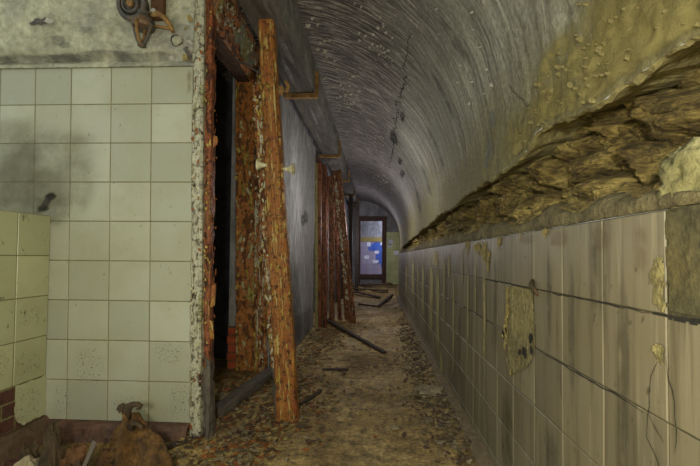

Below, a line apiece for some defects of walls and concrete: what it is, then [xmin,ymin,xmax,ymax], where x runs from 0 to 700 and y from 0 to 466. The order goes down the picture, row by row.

peeling [168,0,291,373]
crack [389,34,412,162]
spalling [388,22,700,274]
spalling [501,279,538,375]
crack [485,279,646,313]
spalling [650,204,700,326]
spalling [0,375,47,435]
crack [534,346,677,466]